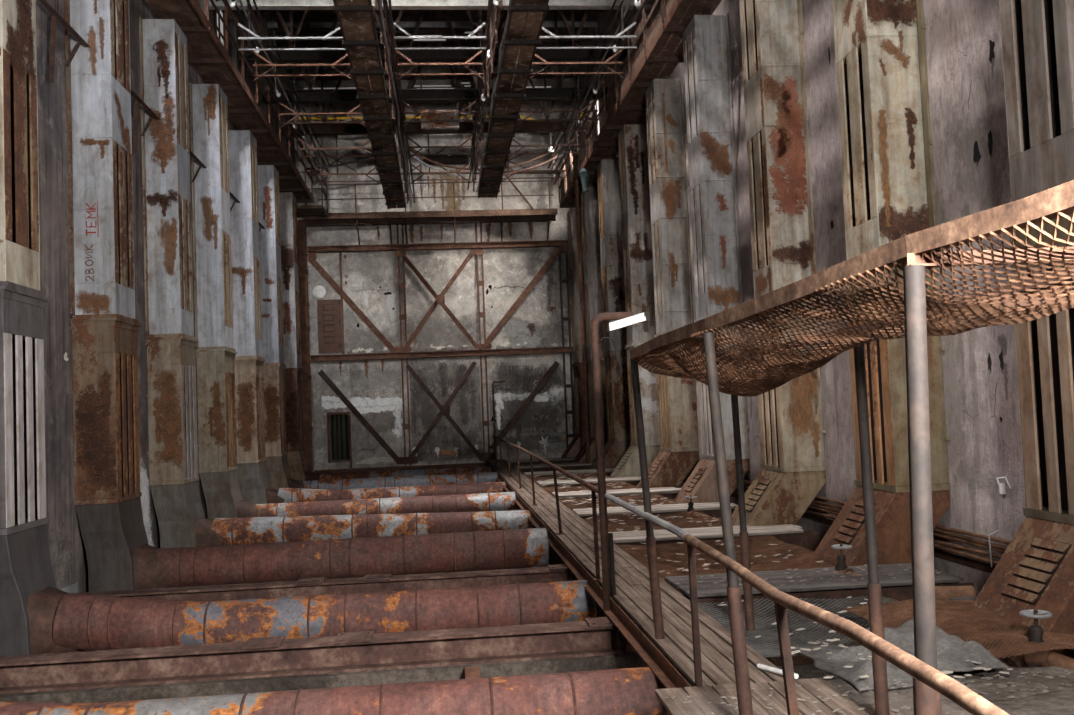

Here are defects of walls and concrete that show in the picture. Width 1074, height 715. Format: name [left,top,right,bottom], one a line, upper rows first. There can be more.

rust [0,0,36,79]
rust [844,0,917,76]
rust [80,93,131,159]
rust [148,39,177,174]
rust [626,135,645,215]
rust [660,93,681,219]
rust [701,132,732,178]
rust [760,73,808,228]
rust [146,189,178,275]
rust [201,197,218,250]
rust [75,371,117,496]